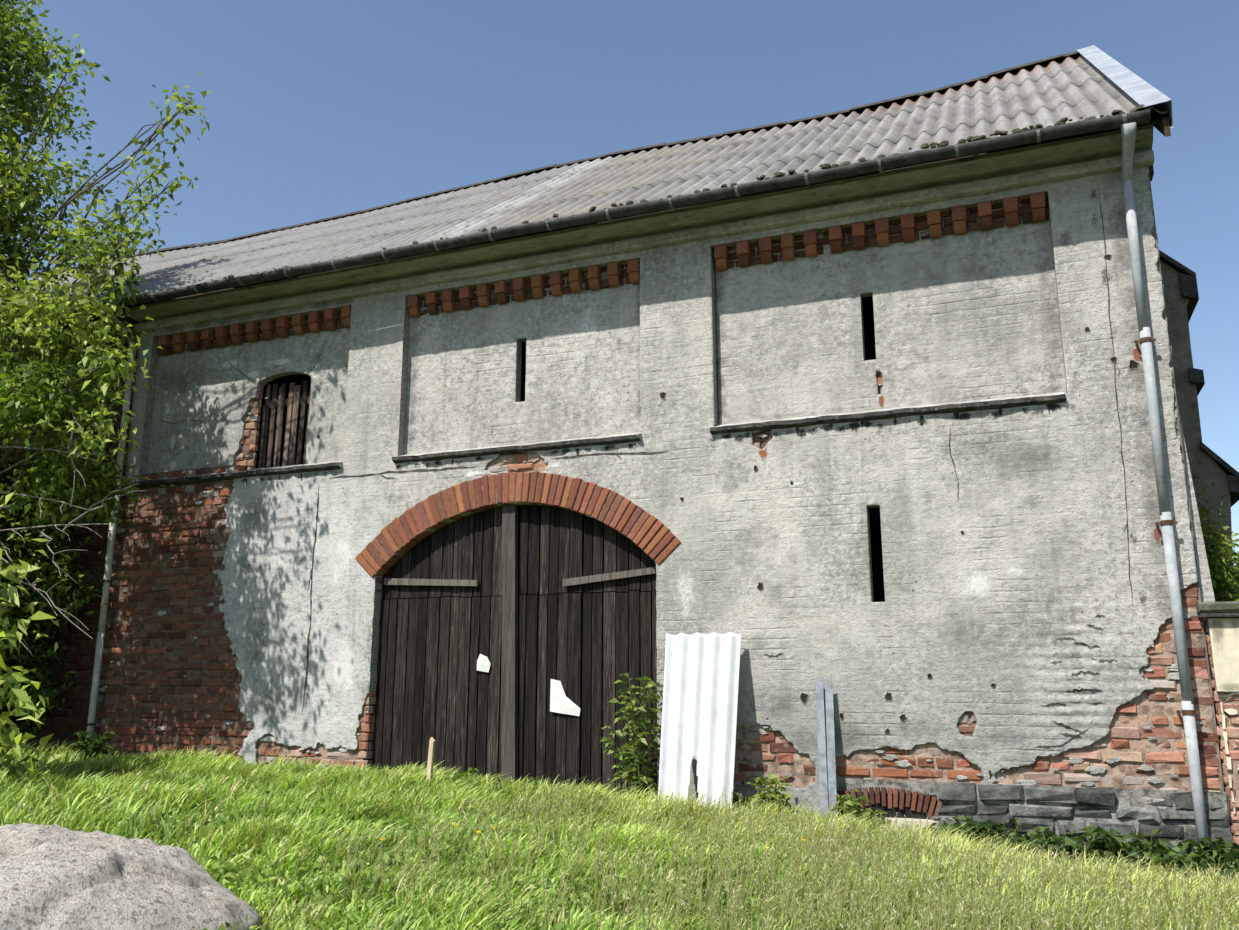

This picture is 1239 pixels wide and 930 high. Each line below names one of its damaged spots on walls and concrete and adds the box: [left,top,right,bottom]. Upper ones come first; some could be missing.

spalling [93,385,373,769]
crack [302,466,478,711]
spalling [485,453,548,474]
crack [949,430,959,496]
spalling [733,585,1239,792]
crack [1098,181,1133,604]